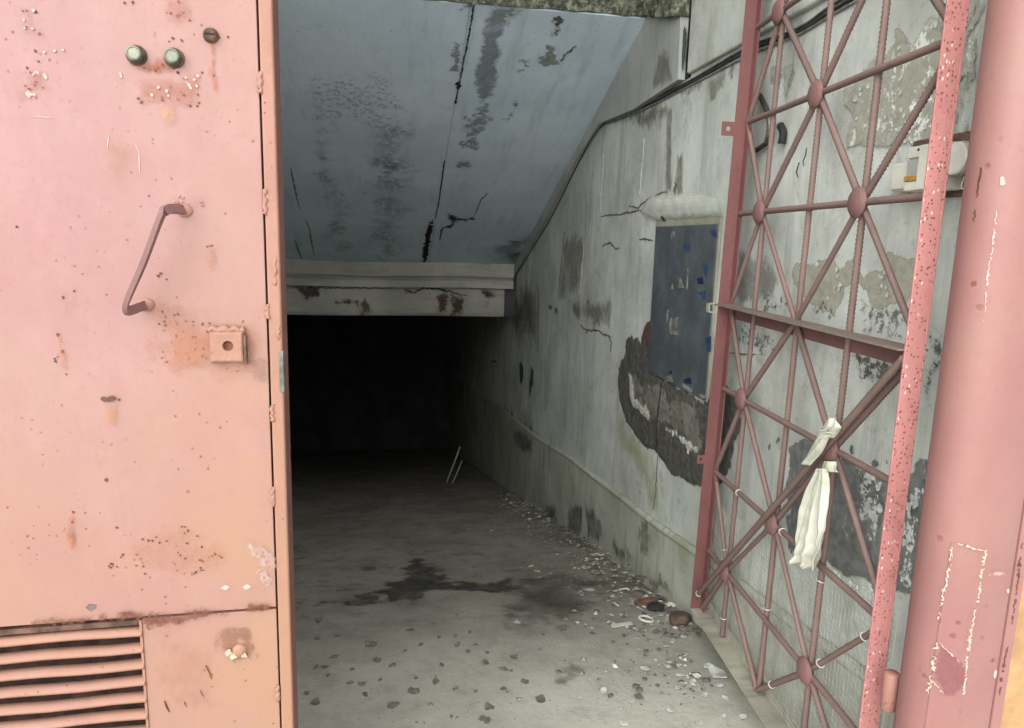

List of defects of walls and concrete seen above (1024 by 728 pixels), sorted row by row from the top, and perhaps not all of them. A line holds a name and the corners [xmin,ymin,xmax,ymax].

crack [454,5,475,104]
water stain [459,9,523,150]
crack [435,161,445,218]
crack [601,191,668,217]
crack [580,301,612,352]
flaking render [618,0,946,728]